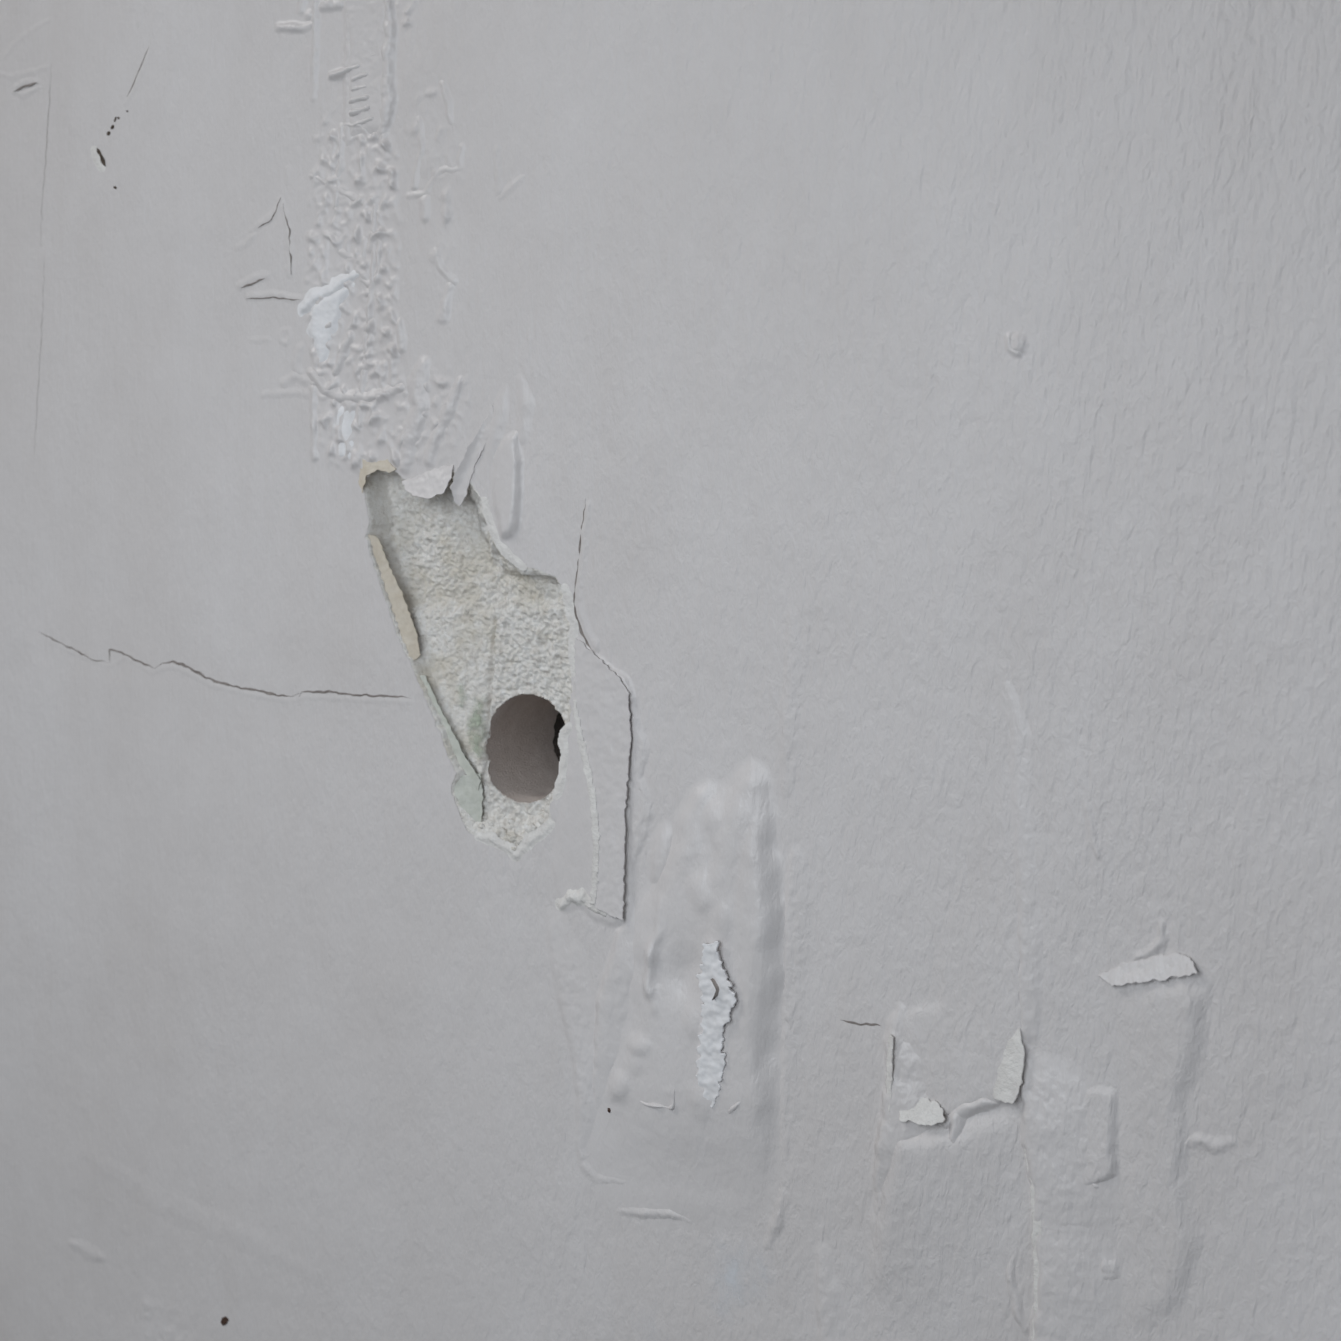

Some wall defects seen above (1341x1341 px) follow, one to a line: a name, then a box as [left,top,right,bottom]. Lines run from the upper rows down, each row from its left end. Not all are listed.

peeling [297,270,359,363]
crack [41,633,416,706]
flaking render [336,403,579,862]